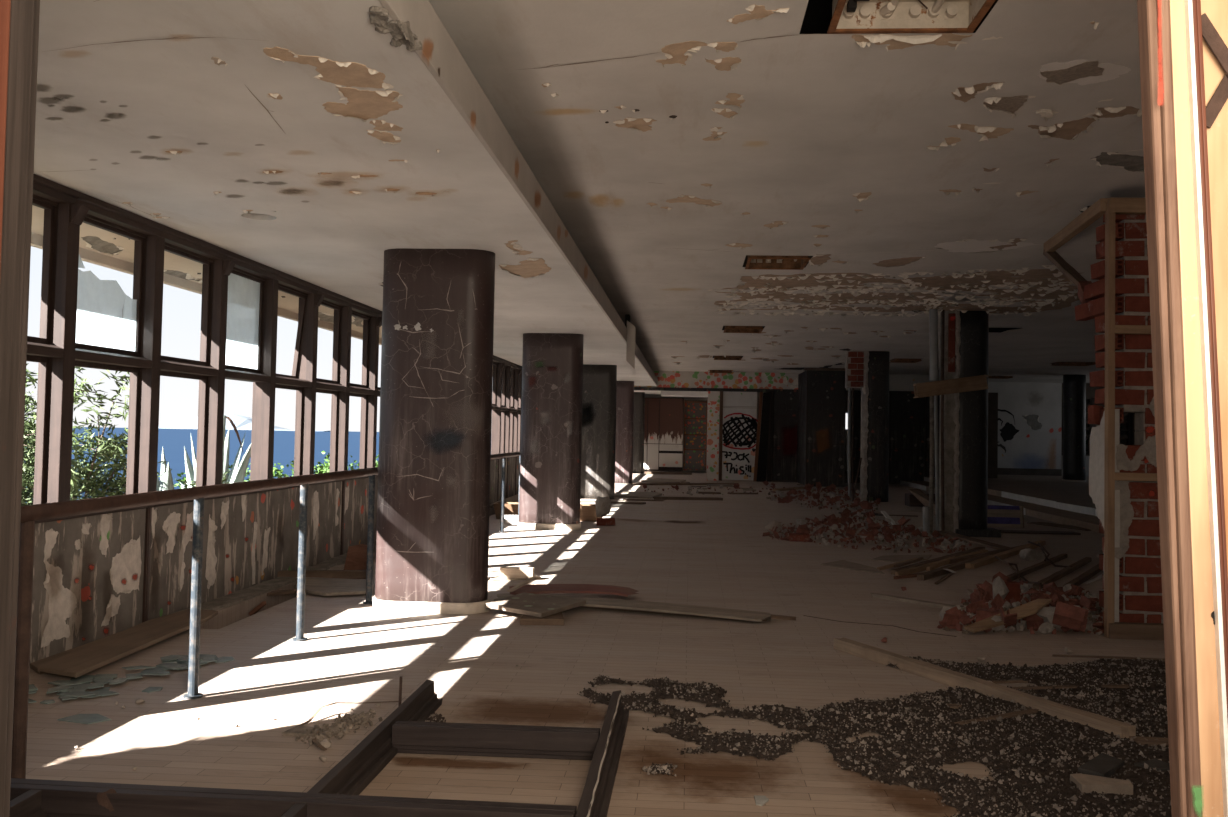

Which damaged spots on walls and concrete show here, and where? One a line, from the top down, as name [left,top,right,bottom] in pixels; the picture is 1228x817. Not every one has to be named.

spalling [369,6,423,52]
peeling [726,4,789,24]
peeling [656,41,742,71]
peeling [263,46,403,144]
peeling [599,105,677,132]
peeling [927,82,1142,151]
peeling [498,240,552,278]
peeling [714,225,1081,389]
crack [397,263,476,405]
crack [396,468,444,500]